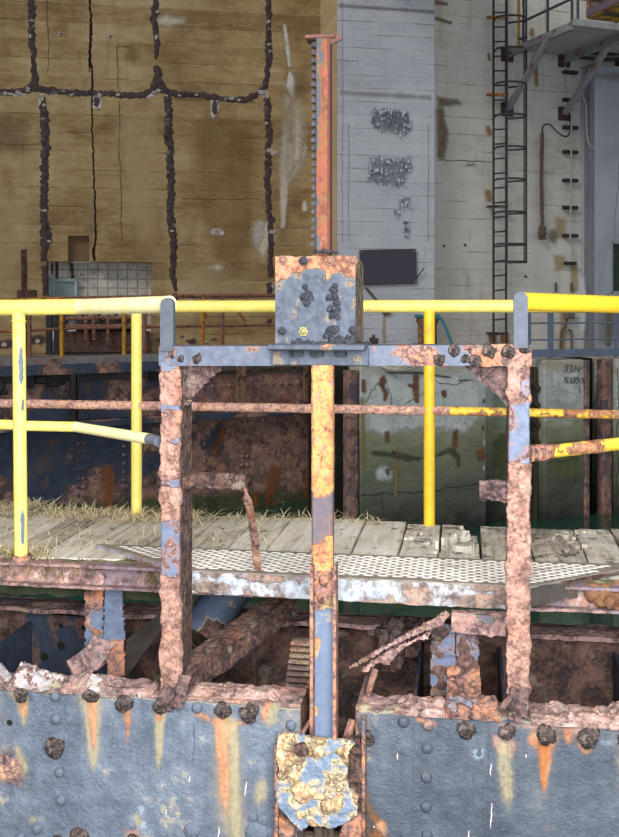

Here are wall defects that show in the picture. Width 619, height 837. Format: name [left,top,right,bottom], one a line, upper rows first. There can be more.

crack [0,0,277,300]
leakage [280,25,307,228]
peeling [371,106,412,137]
leakage [372,451,419,461]
leakage [438,448,460,467]
corrosion [0,748,26,784]
corrosion [0,660,161,764]
corrosion [199,714,242,837]
corrosion [188,681,283,723]
corrosion [345,734,385,837]
corrosion [494,737,515,798]
corrosion [525,700,619,788]